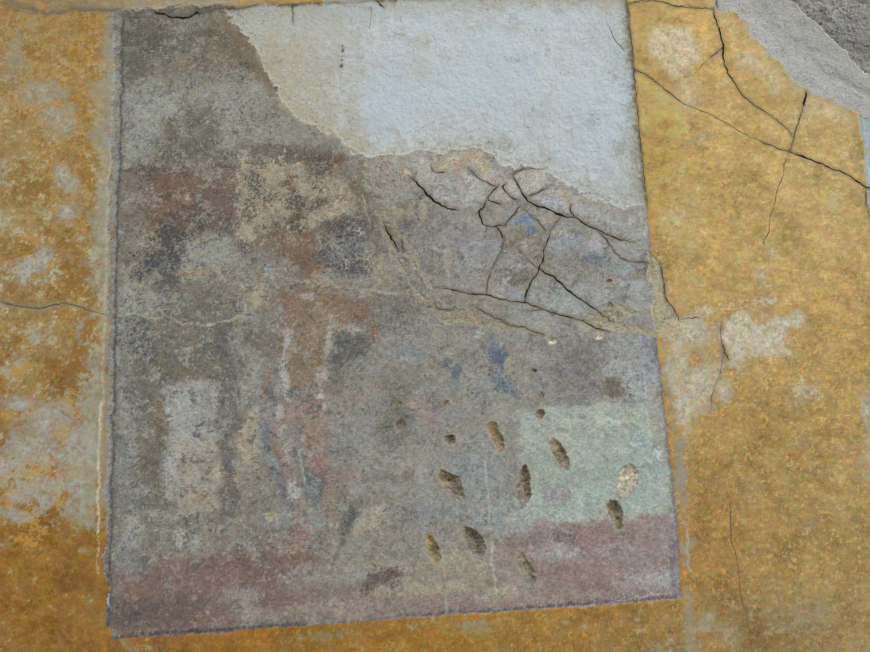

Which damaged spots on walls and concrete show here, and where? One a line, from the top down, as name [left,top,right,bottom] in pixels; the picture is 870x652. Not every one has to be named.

crack [11,1,122,14]
crack [607,0,870,248]
crack [412,163,456,210]
flaking render [223,0,647,340]
crack [362,193,404,249]
crack [436,168,699,335]
crack [0,301,114,316]
crack [710,323,729,406]
spalling [444,434,456,446]